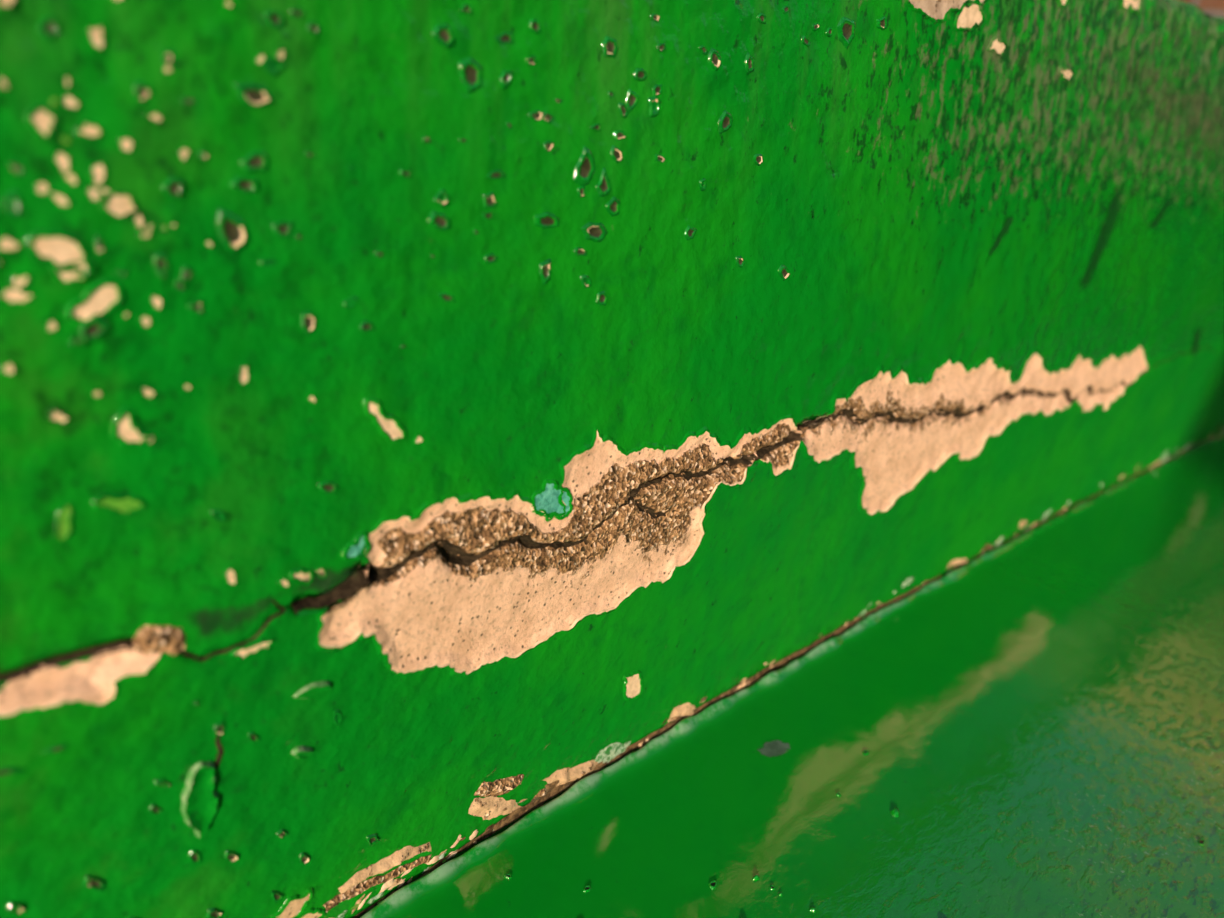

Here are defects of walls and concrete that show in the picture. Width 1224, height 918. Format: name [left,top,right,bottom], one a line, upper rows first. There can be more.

spalling [905,0,987,32]
peeling [2,76,176,240]
peeling [573,68,662,256]
peeling [0,229,195,346]
peeling [110,406,156,448]
crack [0,346,1214,682]
spalling [314,341,1148,677]
spalling [0,646,161,723]
crack [214,729,224,770]
spalling [271,697,707,918]
peeling [622,670,643,701]
crack [353,432,1223,918]